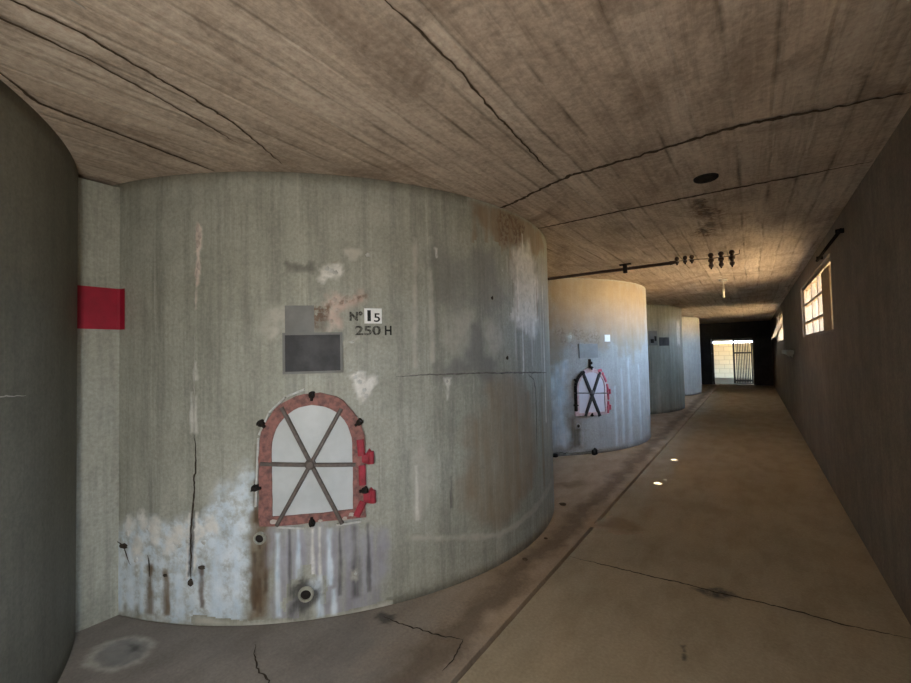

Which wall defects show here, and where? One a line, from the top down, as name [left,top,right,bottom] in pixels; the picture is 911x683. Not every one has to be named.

crack [385,0,909,208]
damp [118,197,652,626]
rust [143,561,172,619]
rust [196,564,207,609]
crack [574,557,911,639]
damp [75,632,162,677]
crack [254,645,270,683]
crack [370,609,463,670]